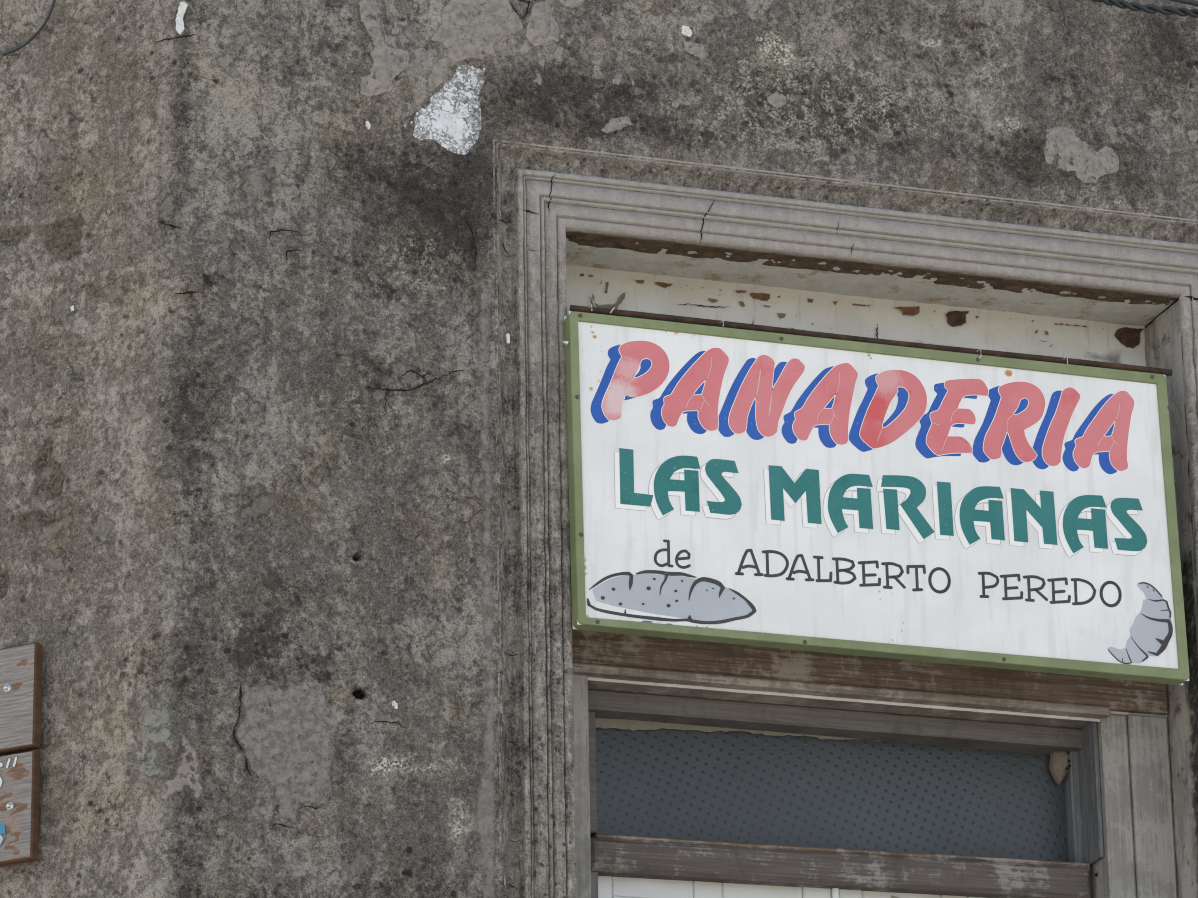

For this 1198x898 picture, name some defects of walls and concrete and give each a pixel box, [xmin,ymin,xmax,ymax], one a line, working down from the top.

peeling [359,0,410,97]
peeling [403,0,585,155]
peeling [1044,125,1120,184]
flaking render [566,232,1178,305]
peeling [592,292,626,309]
flaking render [946,311,969,327]
flaking render [1114,327,1144,348]
crack [363,370,463,415]